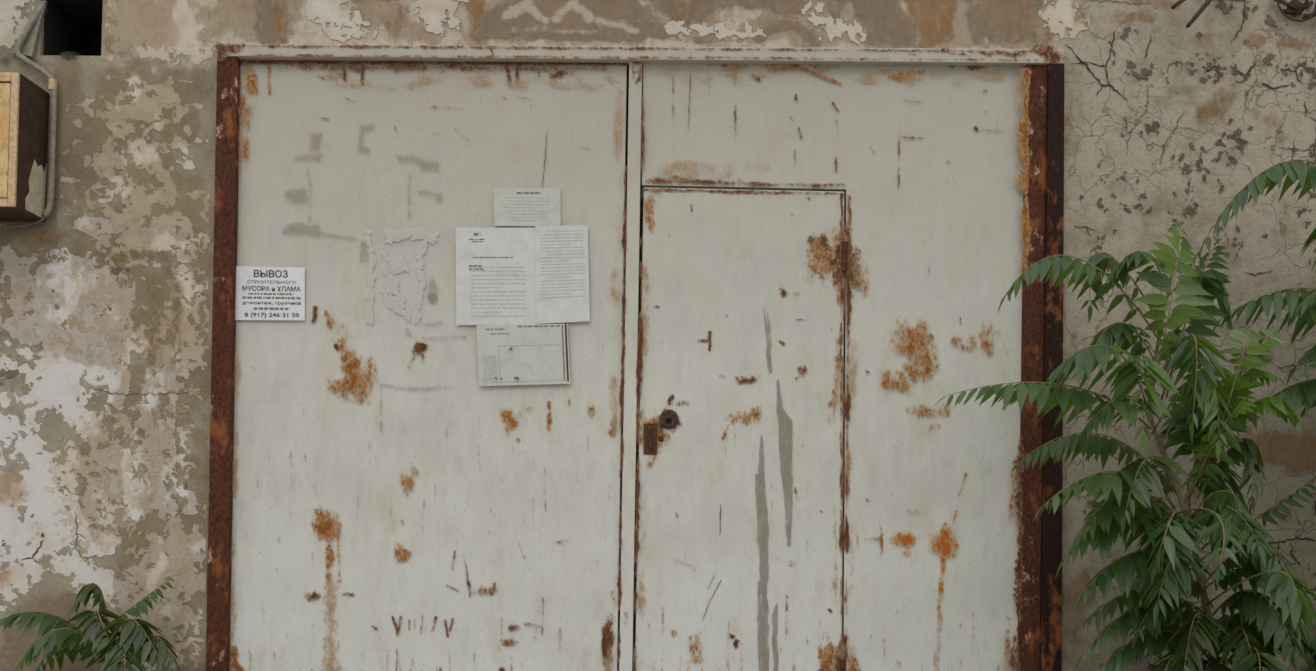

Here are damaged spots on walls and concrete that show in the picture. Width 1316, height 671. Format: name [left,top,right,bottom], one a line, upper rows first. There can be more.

peeling [305,0,378,43]
peeling [414,0,469,38]
peeling [664,20,766,40]
peeling [801,0,867,45]
peeling [1038,0,1091,39]
crack [1067,0,1316,166]
peeling [0,0,218,671]
rust [211,42,1068,671]